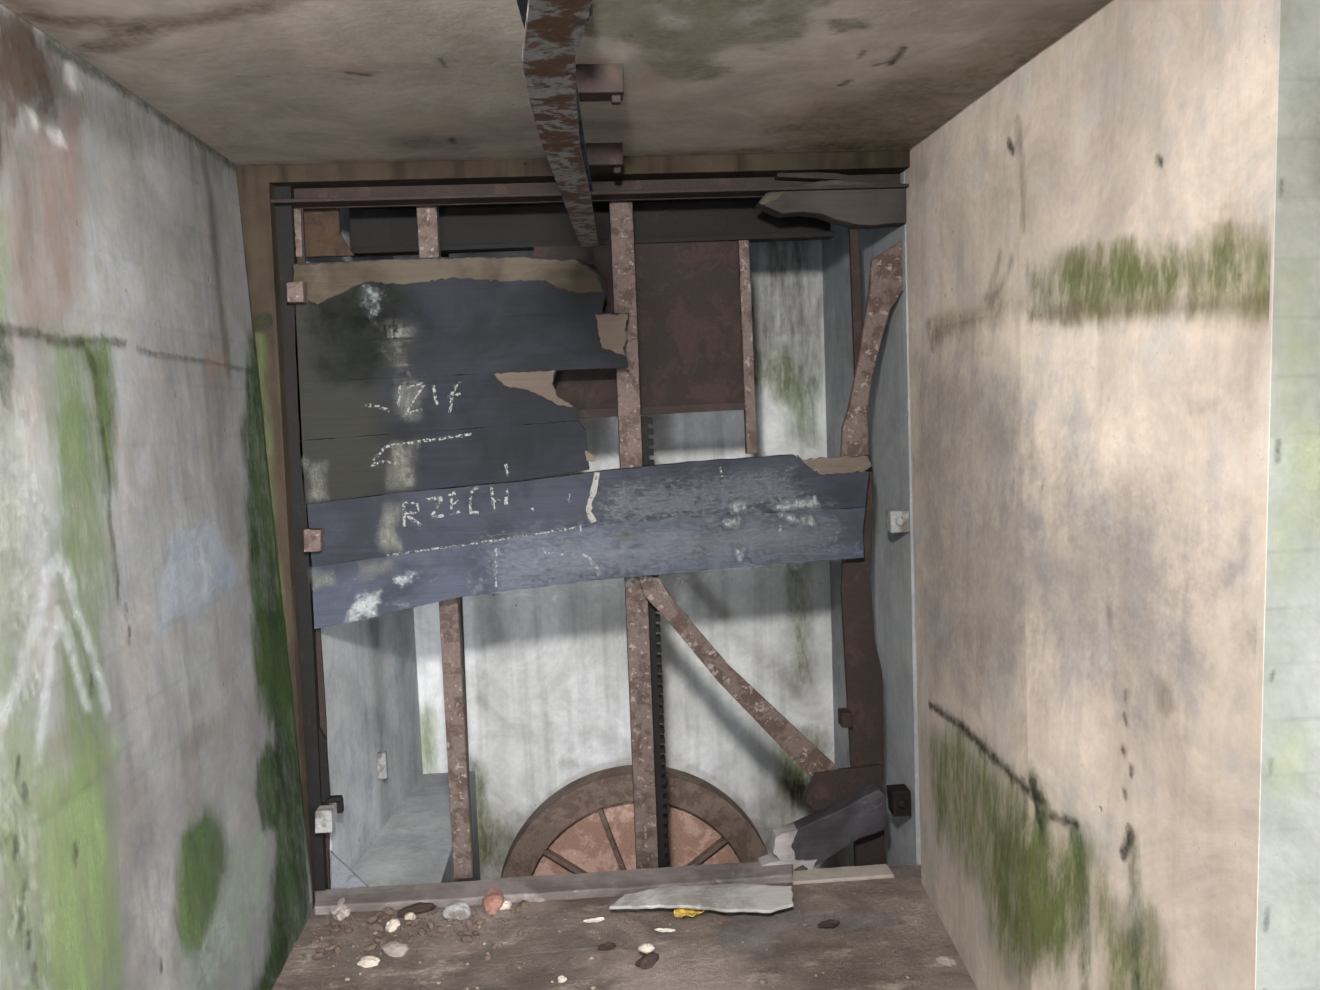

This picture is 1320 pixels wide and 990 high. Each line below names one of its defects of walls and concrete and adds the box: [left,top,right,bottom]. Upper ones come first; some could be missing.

crack [0,154,249,516]
water stain [57,348,98,743]
water stain [252,313,303,781]
water stain [45,784,105,990]
crack [929,703,1078,828]